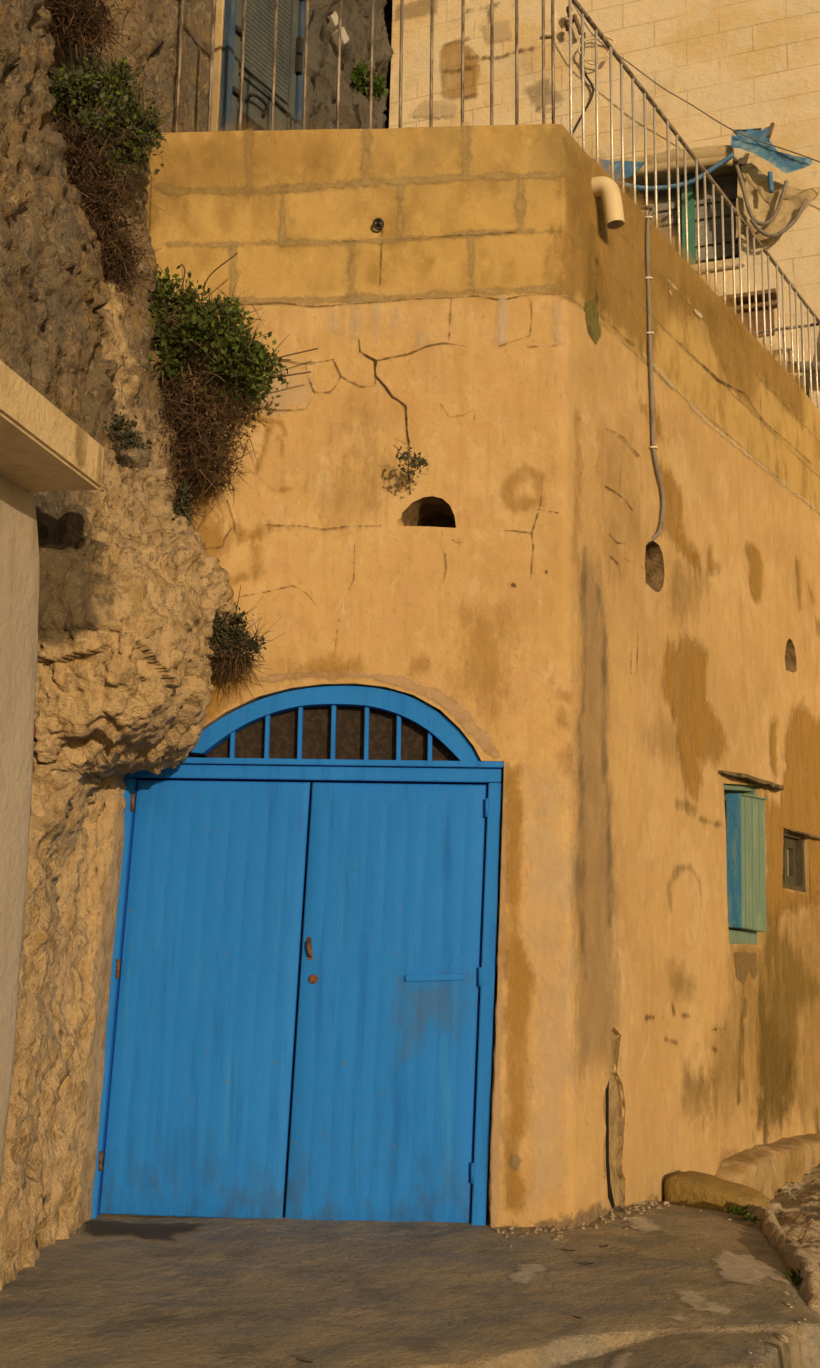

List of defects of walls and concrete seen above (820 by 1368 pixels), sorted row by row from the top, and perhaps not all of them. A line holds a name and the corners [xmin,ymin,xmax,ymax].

crack [241,229,518,494]
damp [746,545,763,601]
damp [663,636,726,795]
damp [508,771,522,904]
damp [716,697,820,1145]
damp [505,940,533,1208]
crack [602,1026,627,1212]
damp [86,1221,199,1241]